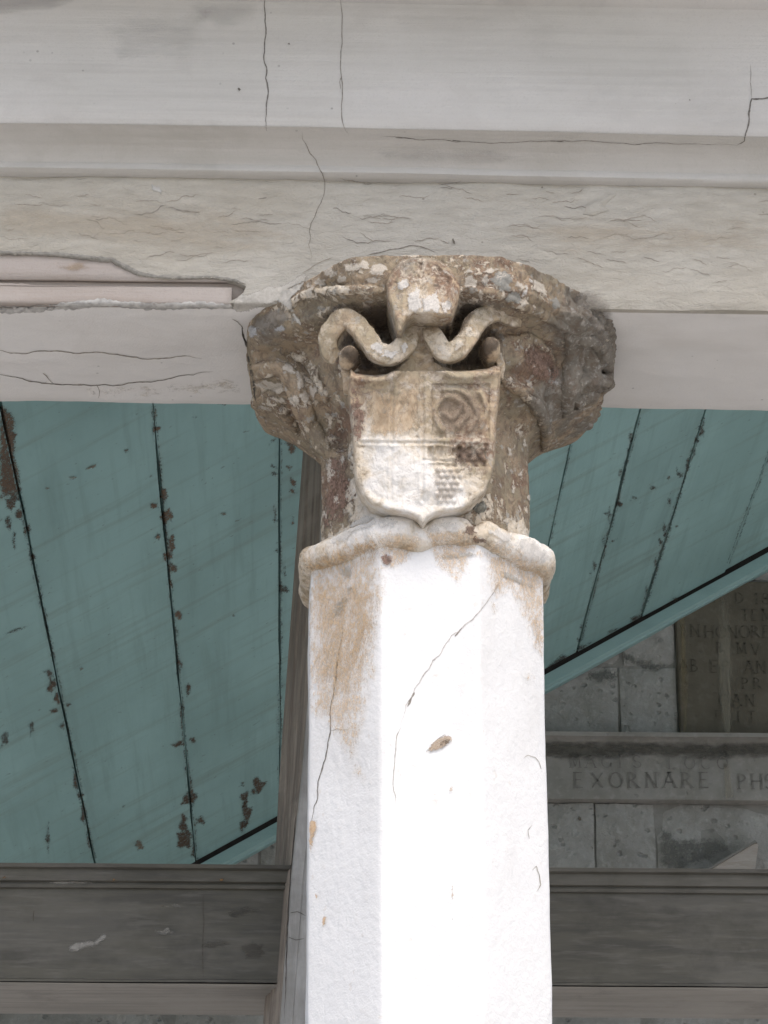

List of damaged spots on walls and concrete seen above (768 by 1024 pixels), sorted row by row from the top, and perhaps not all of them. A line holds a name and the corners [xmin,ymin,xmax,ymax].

crack [262,0,270,131]
crack [338,0,346,128]
crack [386,64,768,145]
crack [1,137,768,284]
peeling [0,298,233,314]
peeling [0,251,244,284]
crack [0,350,202,398]
peeling [151,489,177,588]
crack [393,577,502,802]
spalling [427,733,452,751]
peeling [176,789,205,856]
crack [284,630,349,1014]